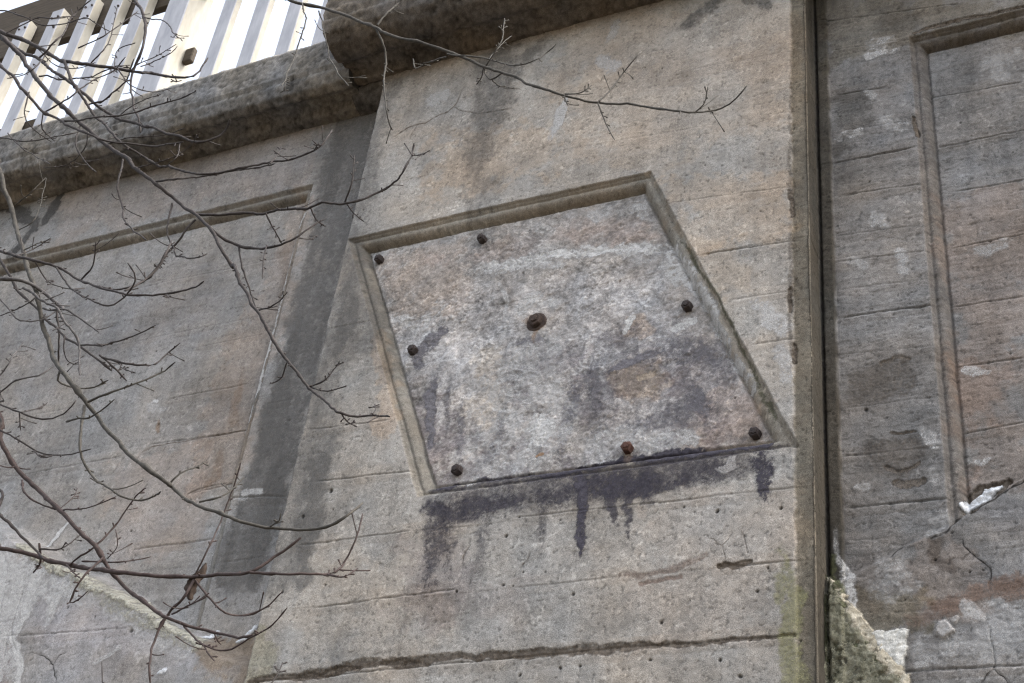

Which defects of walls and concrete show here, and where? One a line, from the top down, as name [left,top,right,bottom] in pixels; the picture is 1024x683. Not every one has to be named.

water stain [212,112,384,590]
water stain [390,301,449,369]
water stain [420,242,792,587]
crack [932,480,1024,589]
spalling [963,479,1013,516]
crack [984,631,1008,683]